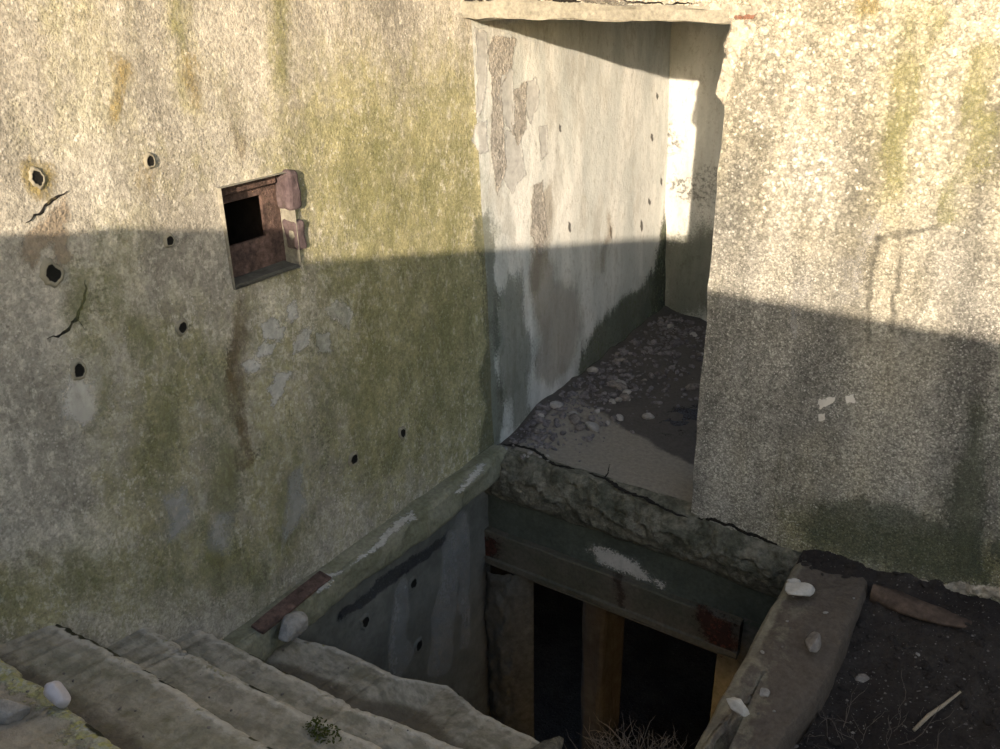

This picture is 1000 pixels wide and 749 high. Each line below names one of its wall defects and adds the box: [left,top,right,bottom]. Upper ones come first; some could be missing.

peeling [471,27,561,195]
crack [26,191,67,223]
peeling [530,181,548,256]
crack [47,281,87,339]
leakage [578,220,667,376]
leakage [818,394,856,421]
crack [502,443,778,546]
rust [251,571,332,635]
leakage [338,537,446,621]
rust [693,605,740,658]